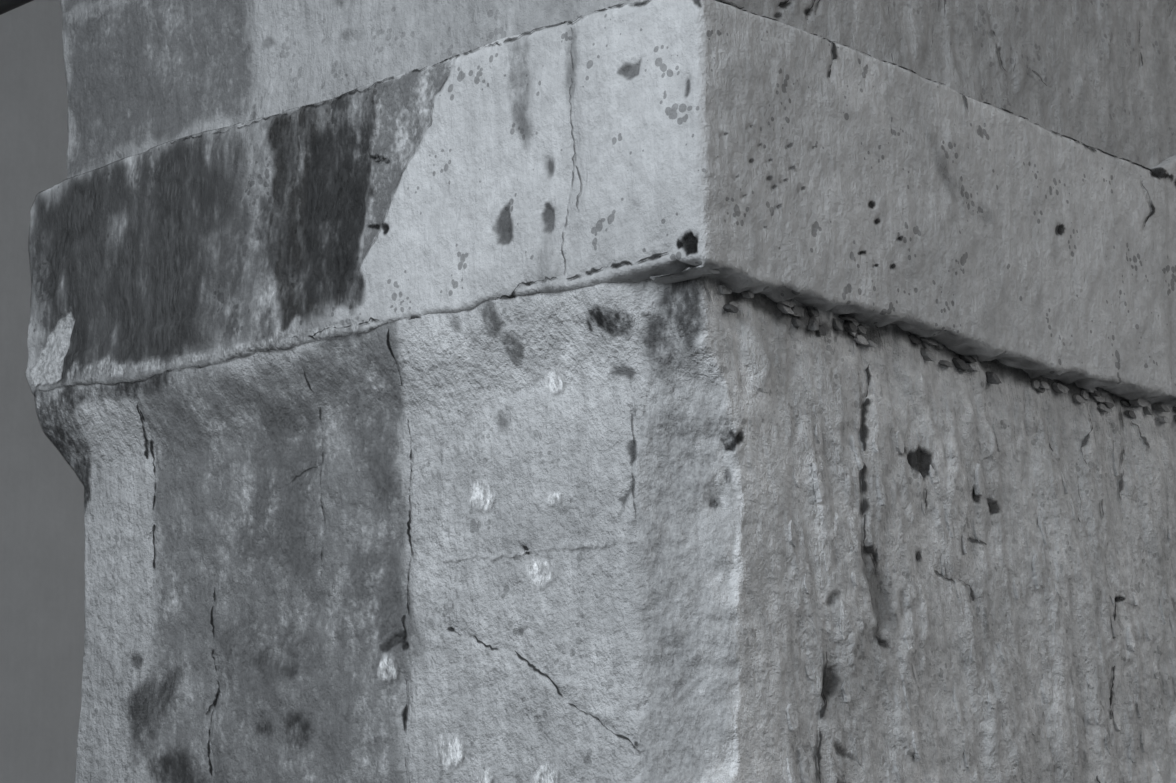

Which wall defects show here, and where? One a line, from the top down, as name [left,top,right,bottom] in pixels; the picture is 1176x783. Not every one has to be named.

water stain [29,125,293,504]
water stain [281,89,374,329]
crack [292,316,420,385]
crack [170,0,668,299]
crack [694,0,1176,229]
crack [447,626,639,752]